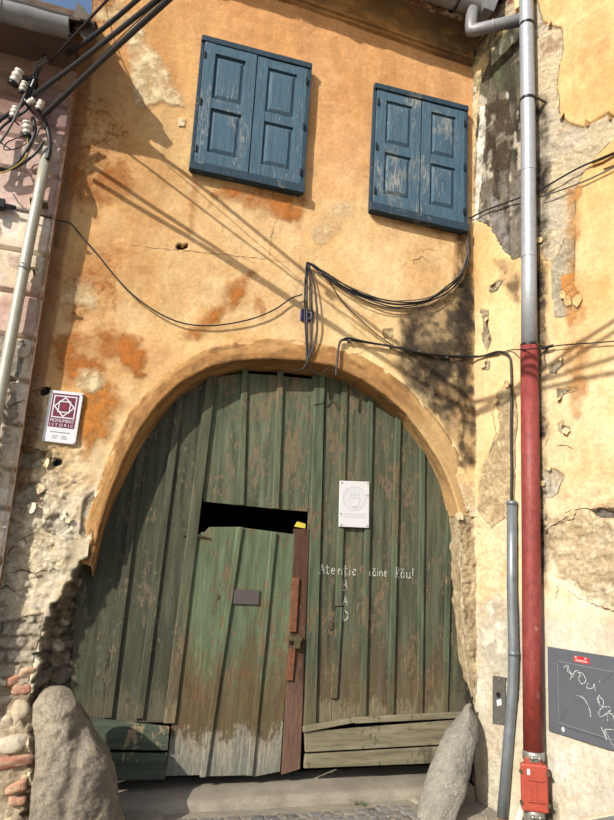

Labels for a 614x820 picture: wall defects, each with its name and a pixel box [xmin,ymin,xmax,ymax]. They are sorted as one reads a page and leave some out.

peeling [127,25,183,105]
flaking render [471,27,521,260]
flaking render [534,0,614,317]
damp [52,332,146,447]
damp [398,234,477,467]
flaking render [480,310,491,370]
flaking render [16,482,47,513]
flaking render [455,380,518,695]
flaking render [540,466,564,498]
crack [544,507,614,535]
crack [556,582,614,611]
flaking render [0,614,43,820]